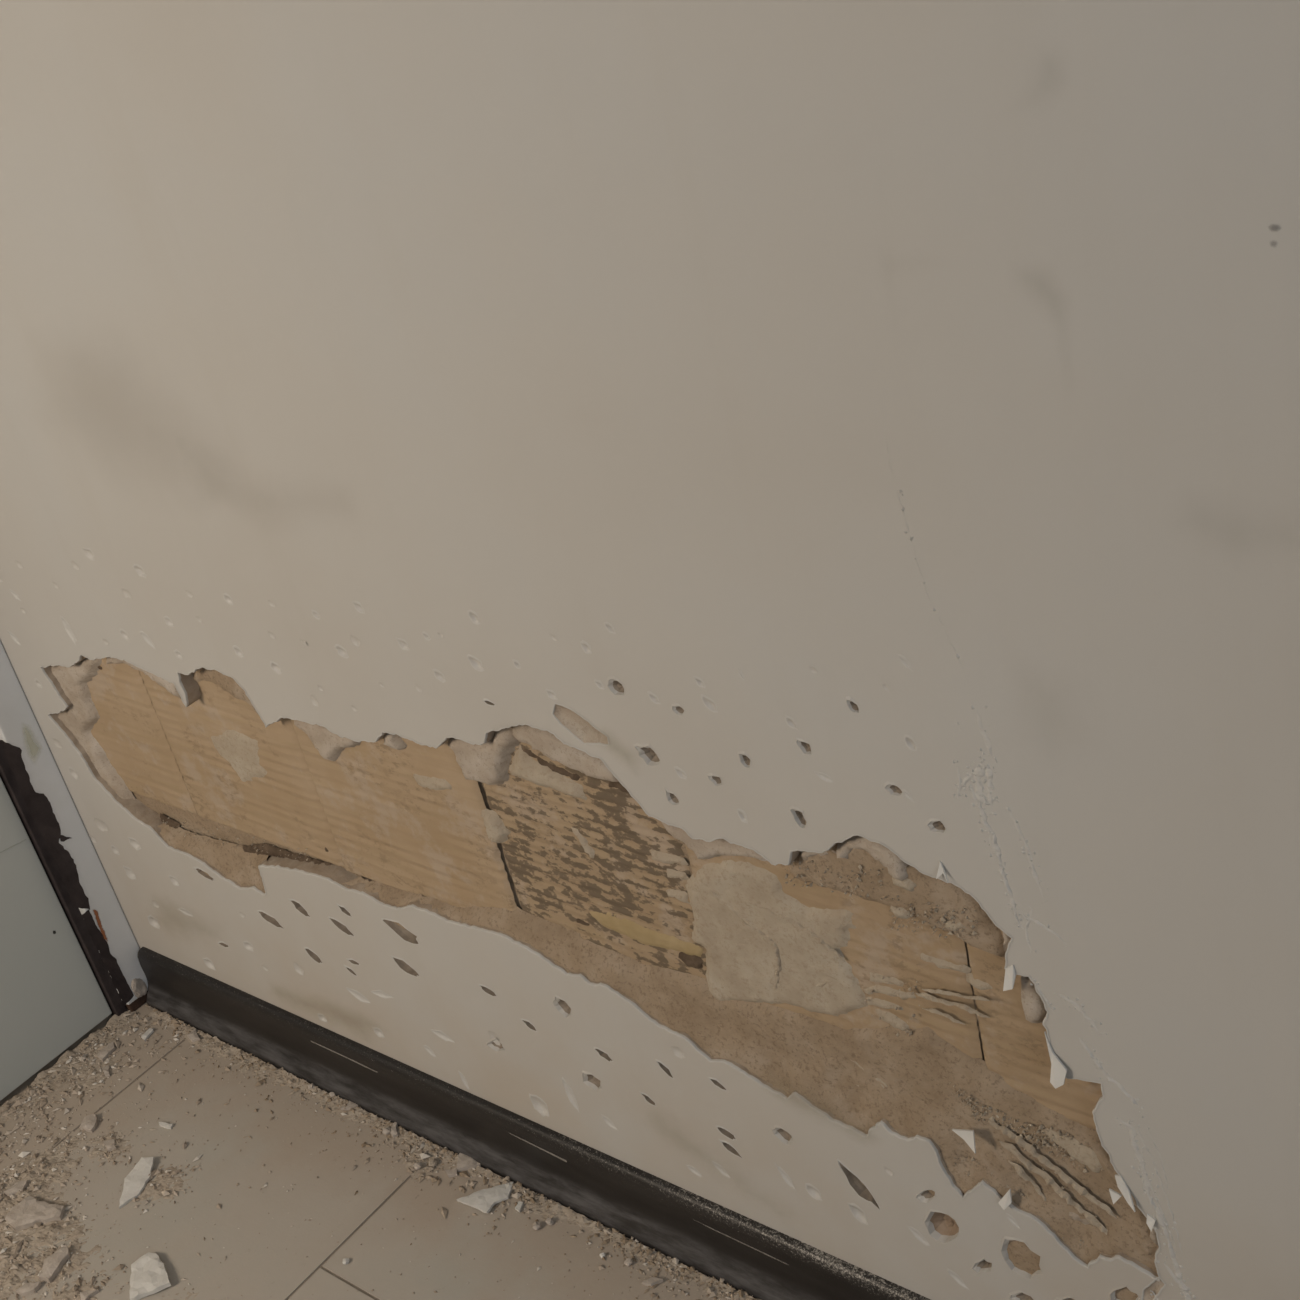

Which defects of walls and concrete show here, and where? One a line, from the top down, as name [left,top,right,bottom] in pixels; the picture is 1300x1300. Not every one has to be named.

peeling [0,740,134,1007]
spalling [40,654,1160,1282]
spalling [971,1236,1043,1300]
spalling [1108,1285,1140,1300]
crack [1141,1277,1166,1300]